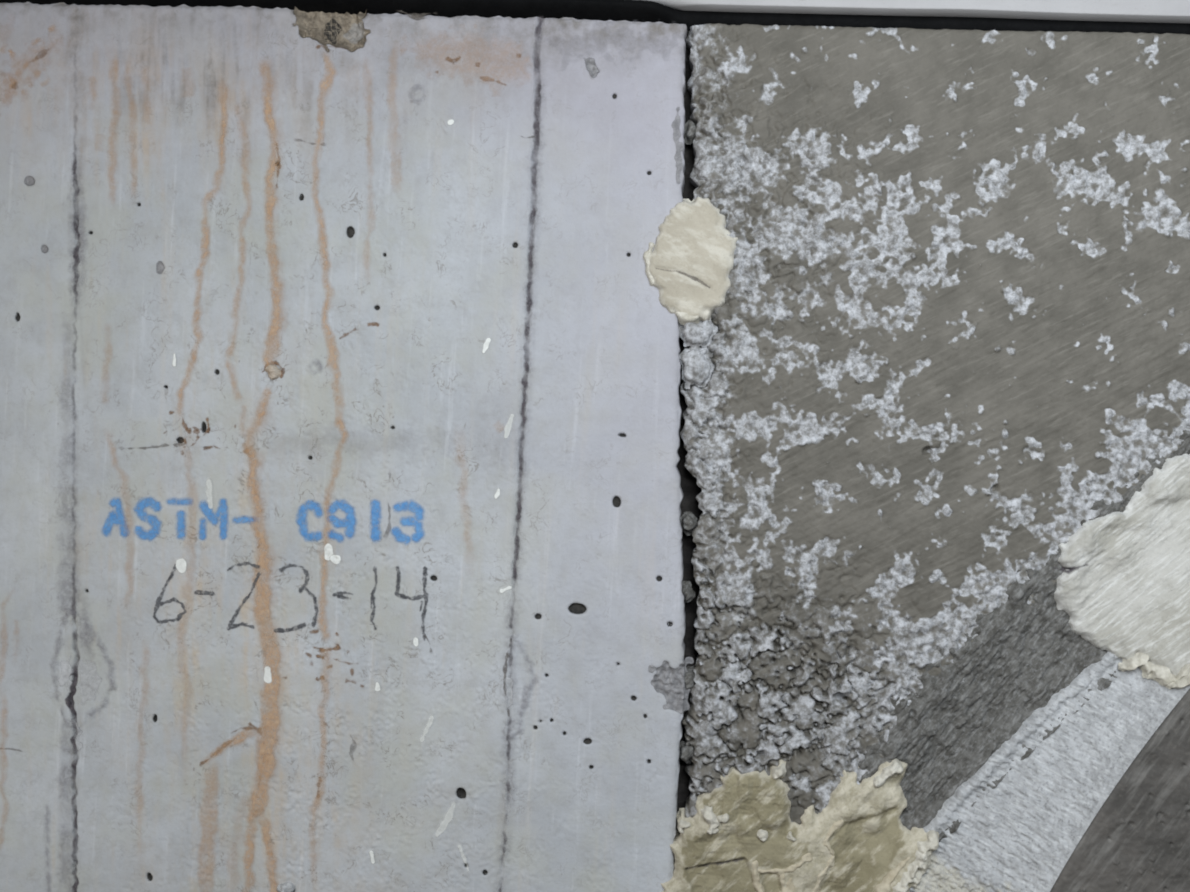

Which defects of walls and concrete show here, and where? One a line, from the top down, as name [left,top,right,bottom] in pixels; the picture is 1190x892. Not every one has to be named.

spalling [293,6,371,52]
crack [72,160,80,290]
crack [513,17,543,579]
crack [59,604,112,892]
rust [201,449,280,892]
rust [306,612,340,681]
crack [503,626,524,755]